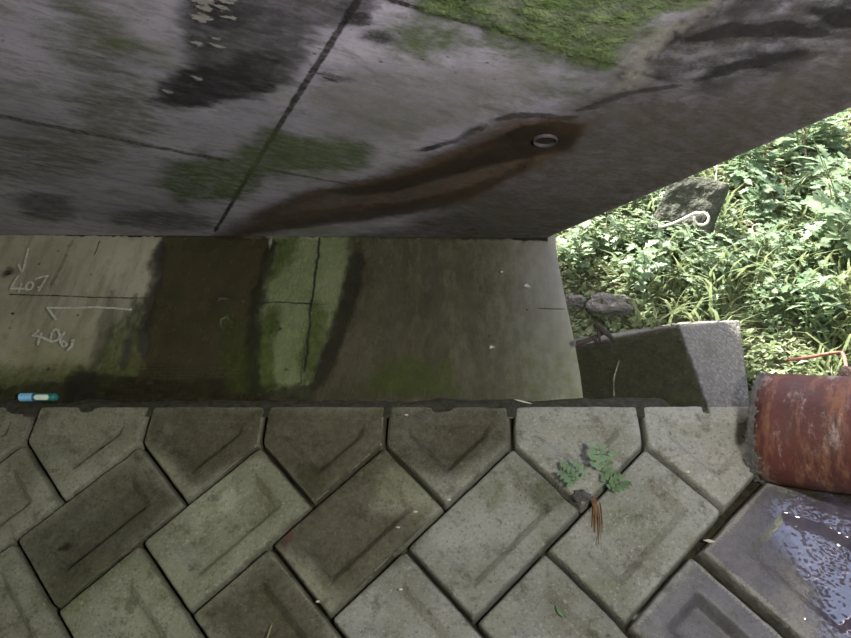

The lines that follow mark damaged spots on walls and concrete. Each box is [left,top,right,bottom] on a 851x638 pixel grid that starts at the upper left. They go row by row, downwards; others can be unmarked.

corrosion [223,118,586,239]
leakage [0,0,851,404]
leakage [152,412,506,584]